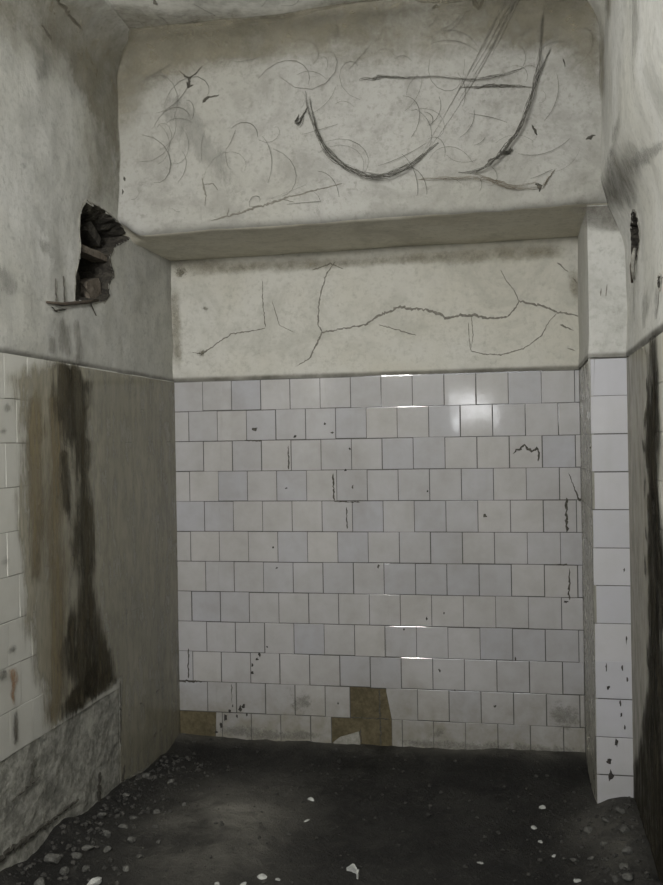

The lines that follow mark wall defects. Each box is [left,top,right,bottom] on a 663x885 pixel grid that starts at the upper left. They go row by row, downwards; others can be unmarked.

crack [57,0,82,29]
spalling [46,199,130,316]
spalling [630,209,641,283]
crack [193,281,291,355]
crack [300,262,578,364]
water stain [16,323,181,782]
water stain [627,338,663,883]
peeling [180,711,216,736]
peeling [332,687,392,746]
peeling [0,681,126,871]